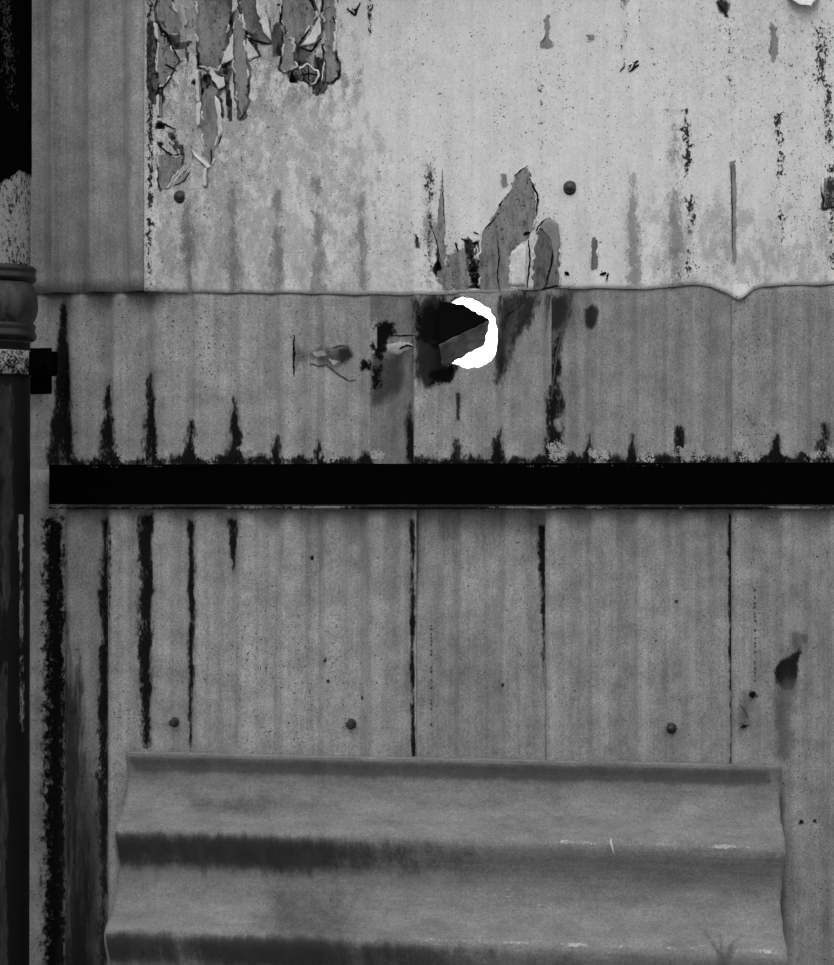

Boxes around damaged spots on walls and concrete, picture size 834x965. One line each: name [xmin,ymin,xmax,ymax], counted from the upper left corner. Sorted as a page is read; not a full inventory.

peeling [153,0,375,190]
peeling [430,165,569,291]
peeling [589,237,609,281]
peeling [820,175,834,207]